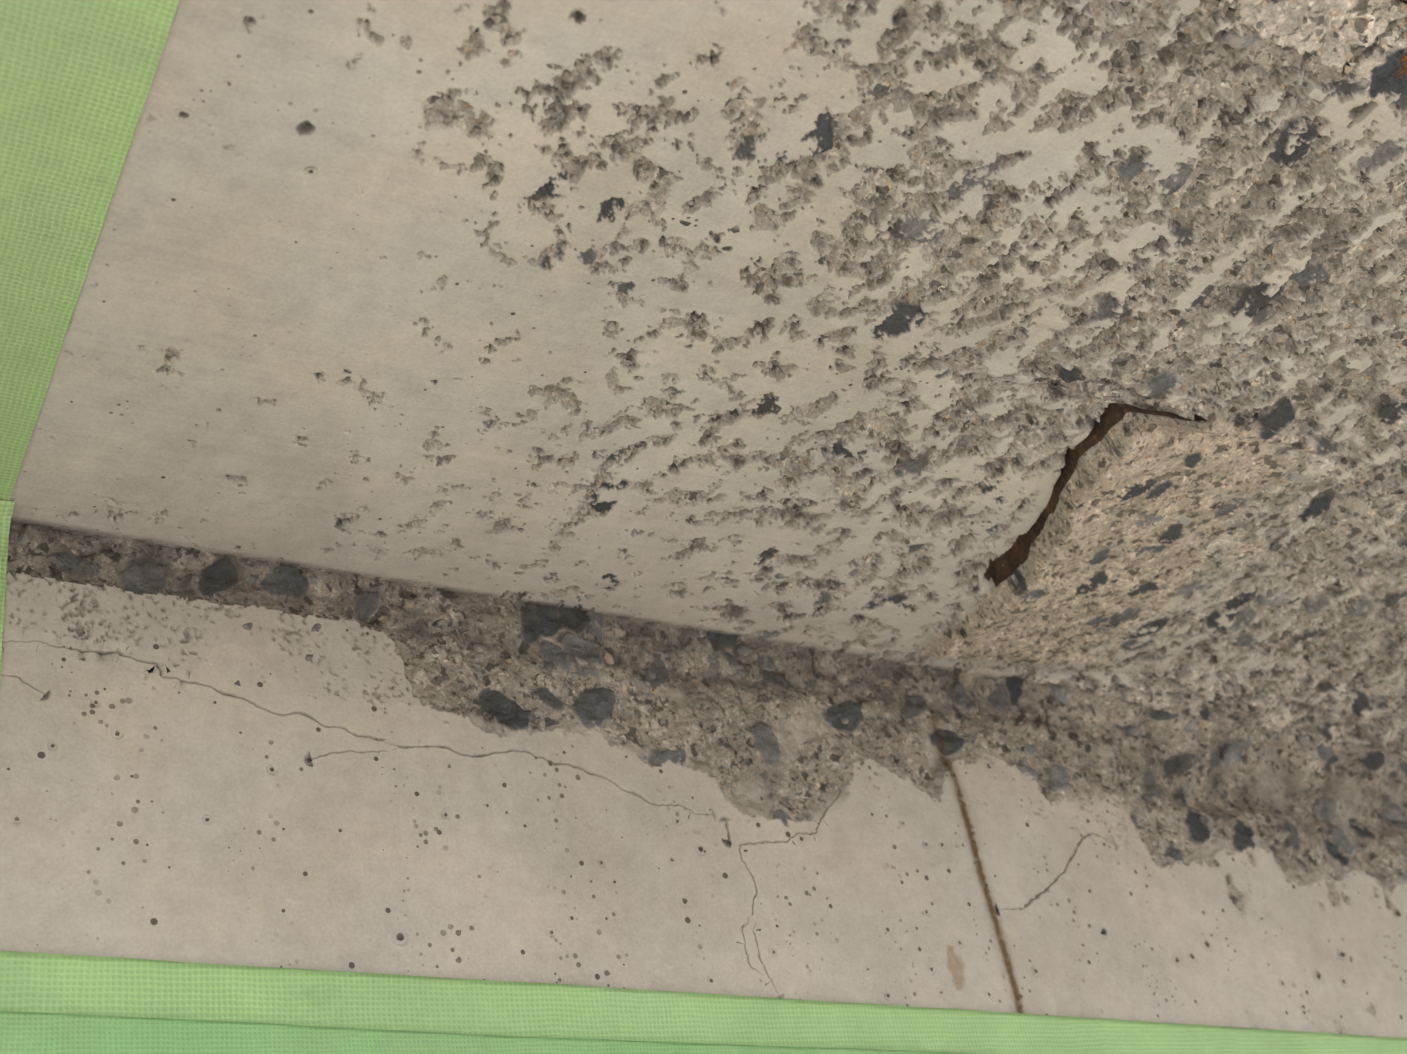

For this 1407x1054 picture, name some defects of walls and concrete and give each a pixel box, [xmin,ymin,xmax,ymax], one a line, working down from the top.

spalling [347,0,412,70]
spalling [447,0,527,76]
spalling [412,88,505,202]
spalling [461,46,740,310]
spalling [313,369,404,427]
spalling [394,426,456,489]
spalling [478,322,521,365]
spalling [476,406,573,448]
spalling [514,0,1407,756]
spalling [320,483,507,580]
spalling [4,522,1407,896]
crack [0,630,849,998]